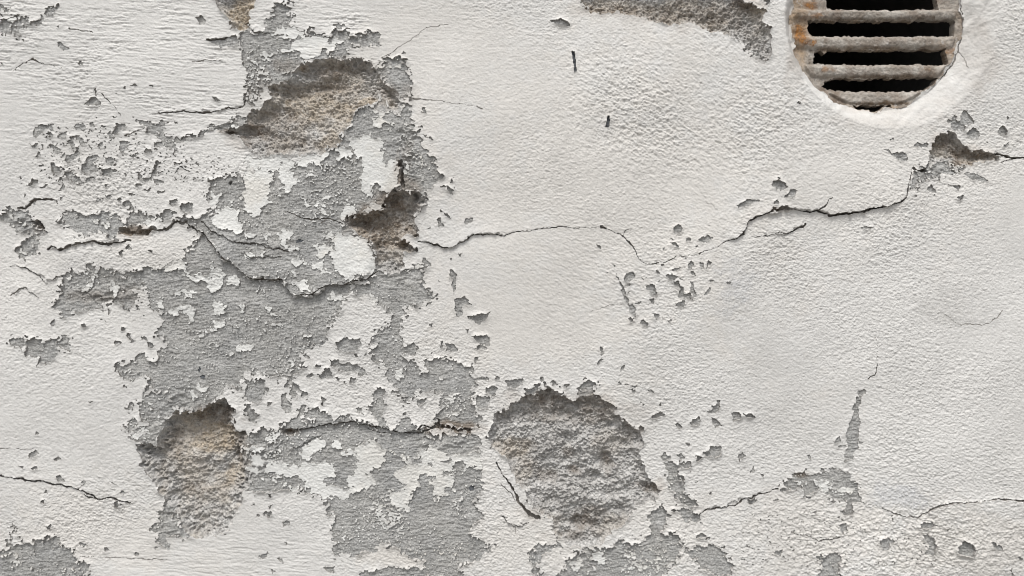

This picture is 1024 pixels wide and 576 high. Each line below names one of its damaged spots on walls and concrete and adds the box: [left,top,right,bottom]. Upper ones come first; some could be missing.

peeling [0,4,60,41]
flaking render [884,111,1009,199]
peeling [0,206,48,261]
crack [418,197,906,265]
peeling [21,0,772,576]
peeling [6,334,74,365]
crack [0,474,131,503]
crack [496,462,541,534]
crack [696,488,778,515]
peeling [746,389,866,576]
crack [882,498,1024,518]
peeling [0,524,91,576]